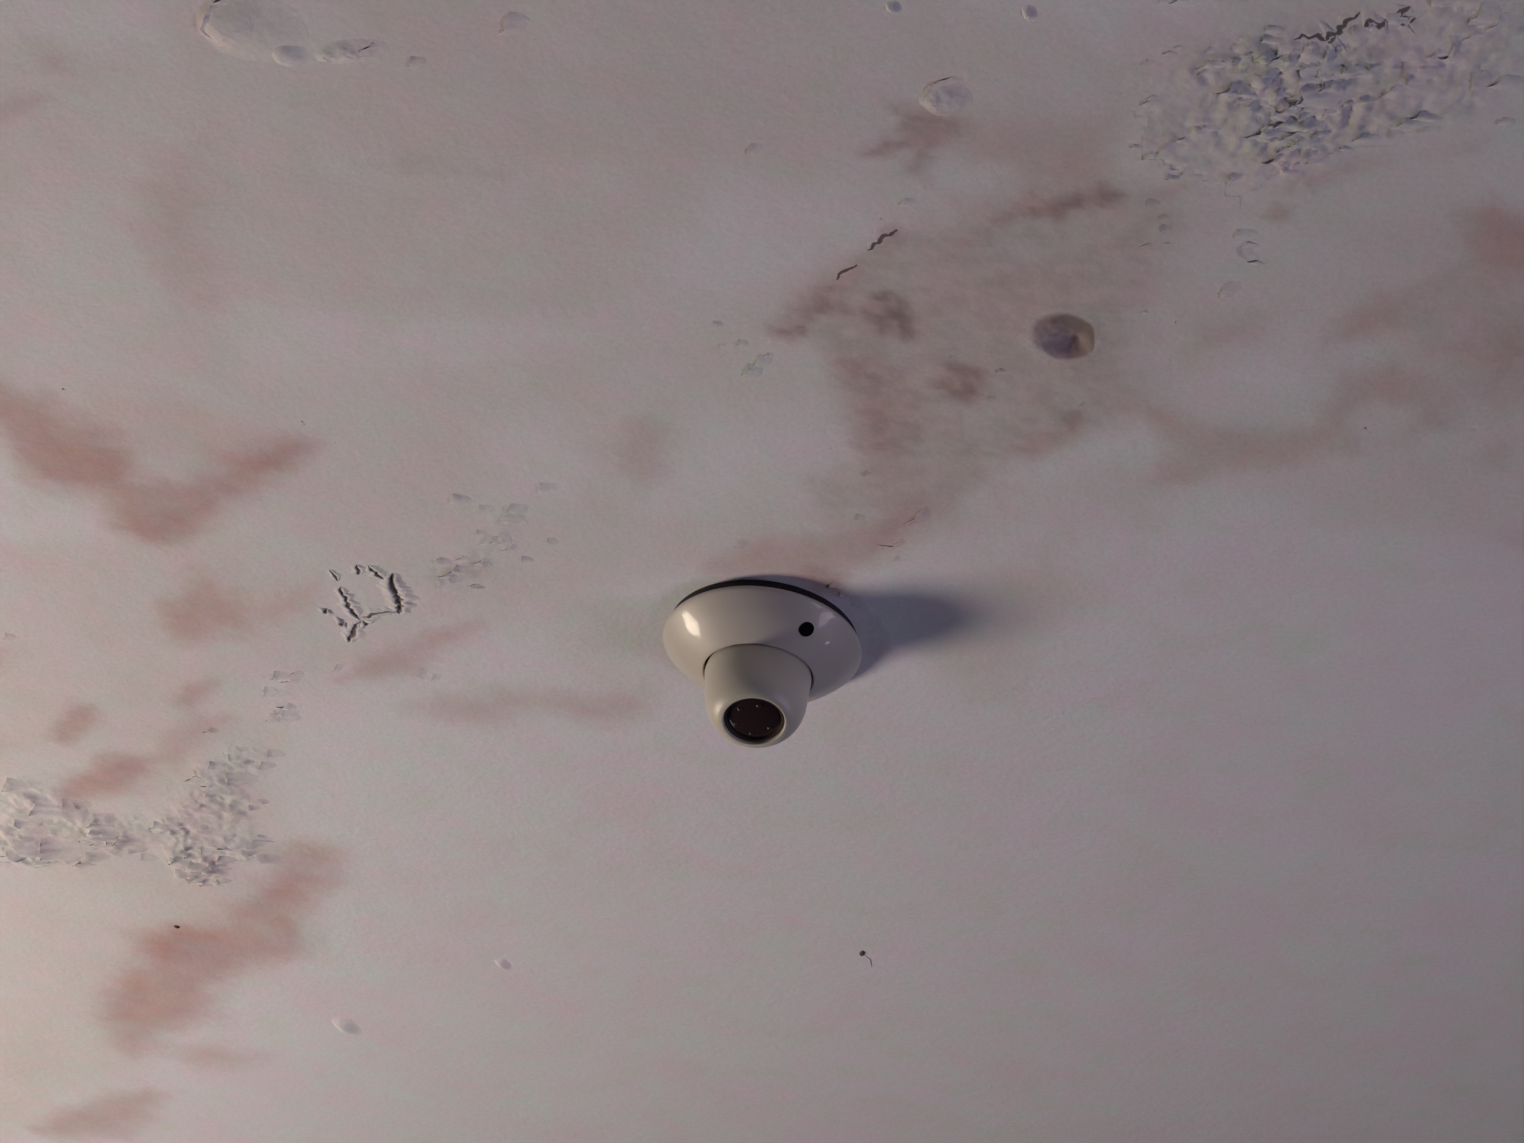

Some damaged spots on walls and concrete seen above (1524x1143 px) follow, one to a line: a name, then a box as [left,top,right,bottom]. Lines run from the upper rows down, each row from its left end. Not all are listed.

peeling [1117,0,1524,213]
damp [739,86,1280,528]
hole [1019,303,1108,369]
damp [1301,228,1524,431]
peeling [0,737,286,889]